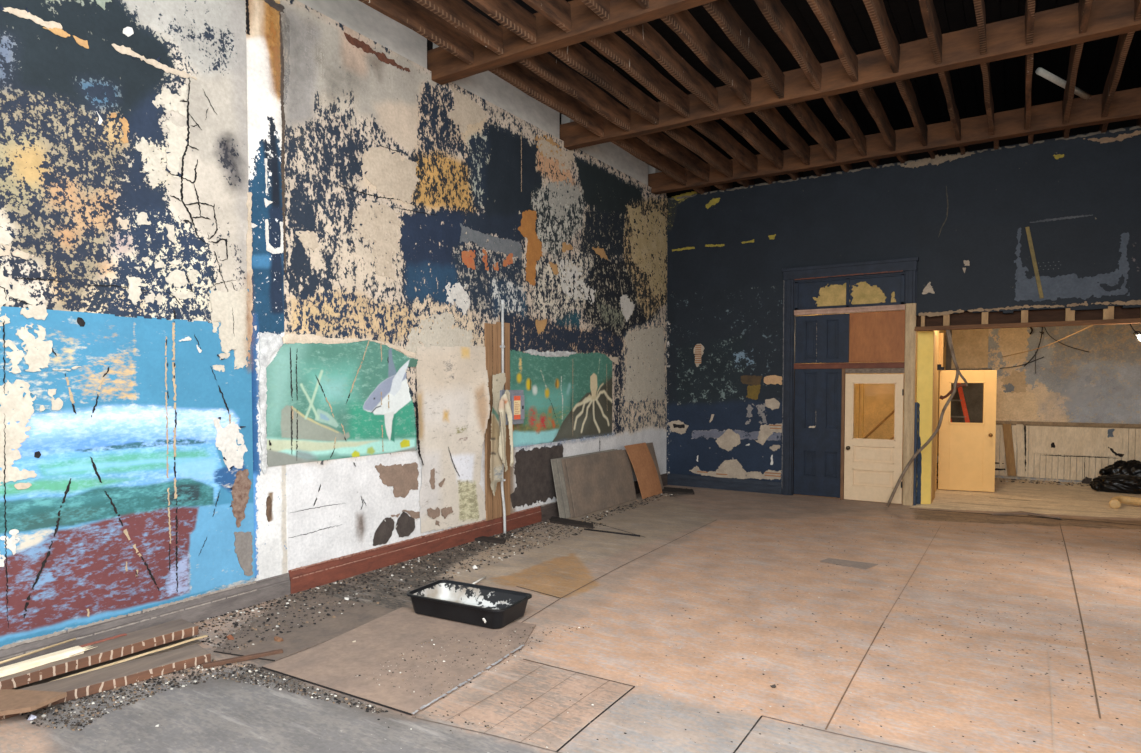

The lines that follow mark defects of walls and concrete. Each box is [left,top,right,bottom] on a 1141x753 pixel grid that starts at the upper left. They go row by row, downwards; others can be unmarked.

peeling [0,4,89,49]
peeling [96,27,197,189]
peeling [117,212,151,230]
peeling [459,210,596,304]
peeling [0,229,81,490]
crack [0,73,235,628]
peeling [209,141,474,576]
peeling [524,349,577,376]
flaking render [510,443,564,509]
flaking render [689,375,782,480]
peeling [0,529,20,567]
spalling [24,478,71,618]